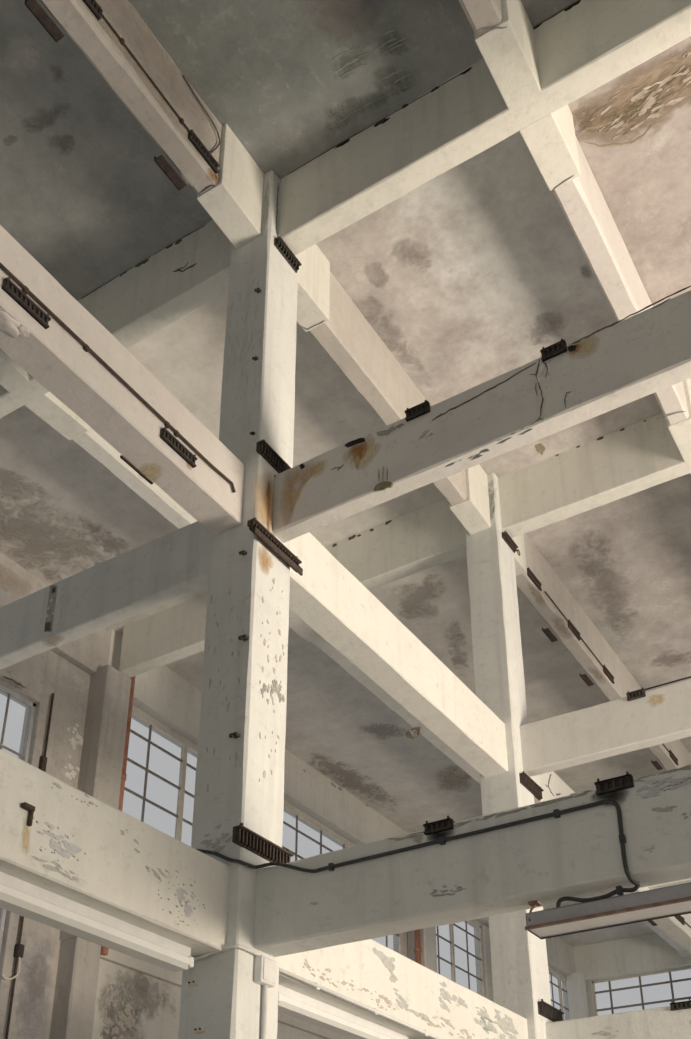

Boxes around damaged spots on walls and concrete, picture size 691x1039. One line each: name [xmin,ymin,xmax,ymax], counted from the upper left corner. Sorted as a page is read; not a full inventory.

crack [572,285,691,344]
crack [432,359,575,422]
corrosion [345,438,373,467]
corrosion [260,463,323,530]
water stain [0,503,123,576]
water stain [303,756,386,807]
peeling [32,818,86,881]
peeling [302,947,519,1039]